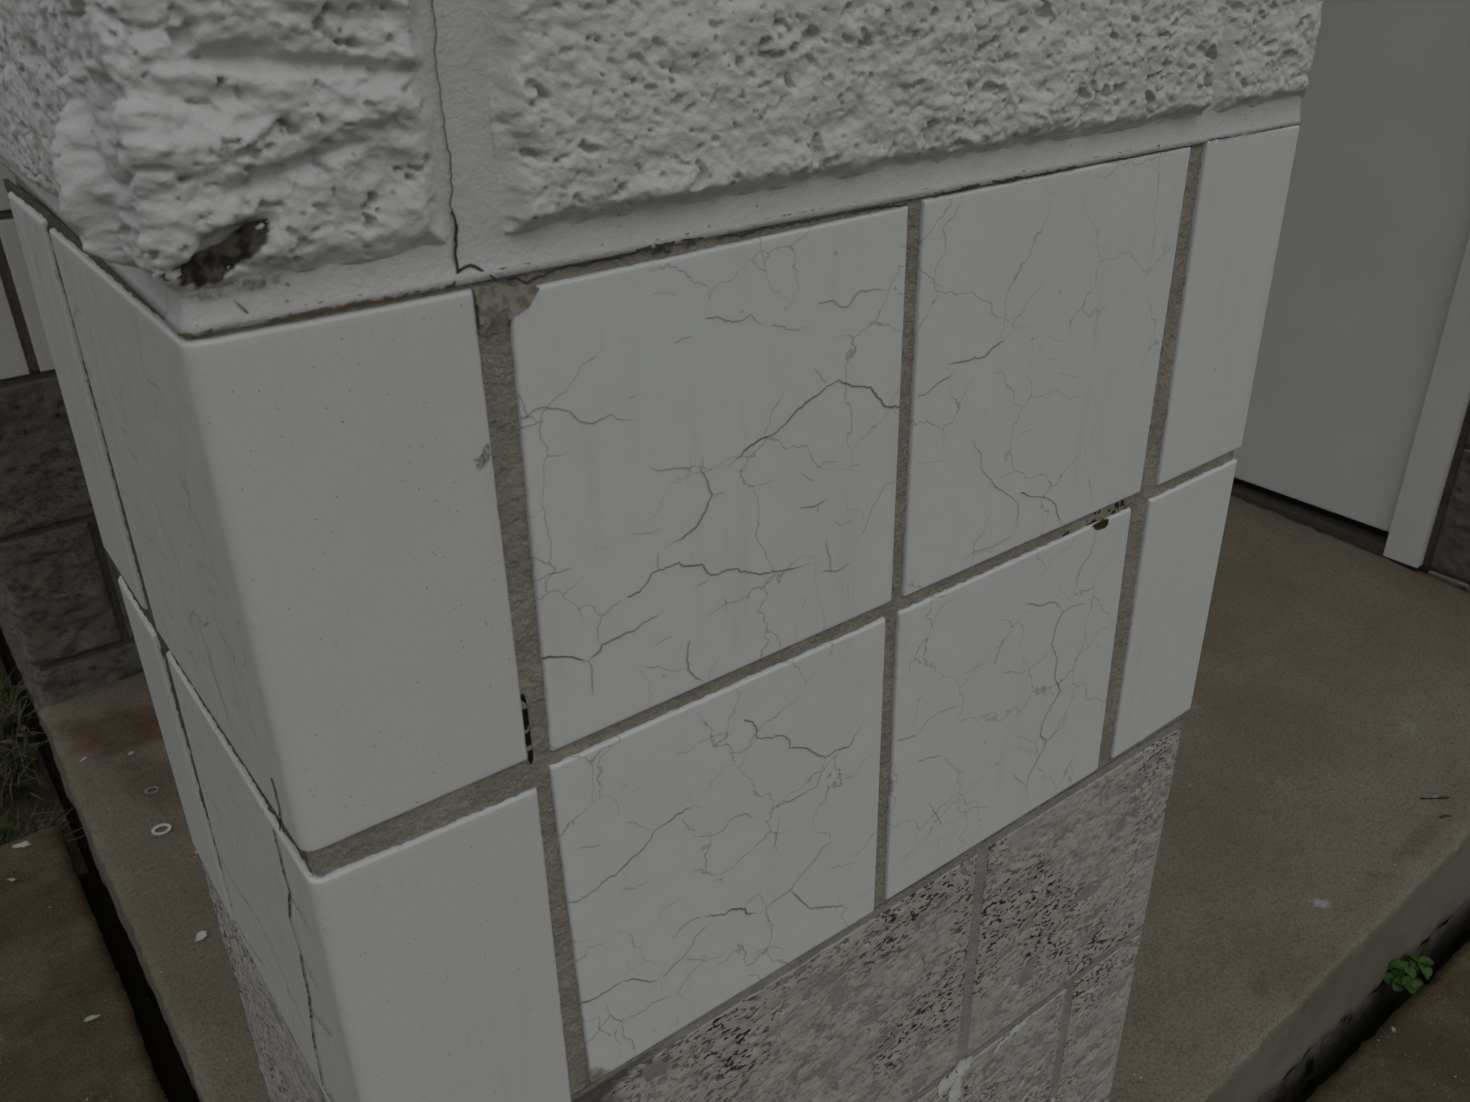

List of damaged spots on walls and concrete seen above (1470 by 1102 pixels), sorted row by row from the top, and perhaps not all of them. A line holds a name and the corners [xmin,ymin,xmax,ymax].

crack [177,0,1289,338]
crack [740,380,901,457]
crack [541,471,794,660]
crack [745,720,856,756]
crack [222,778,333,1102]